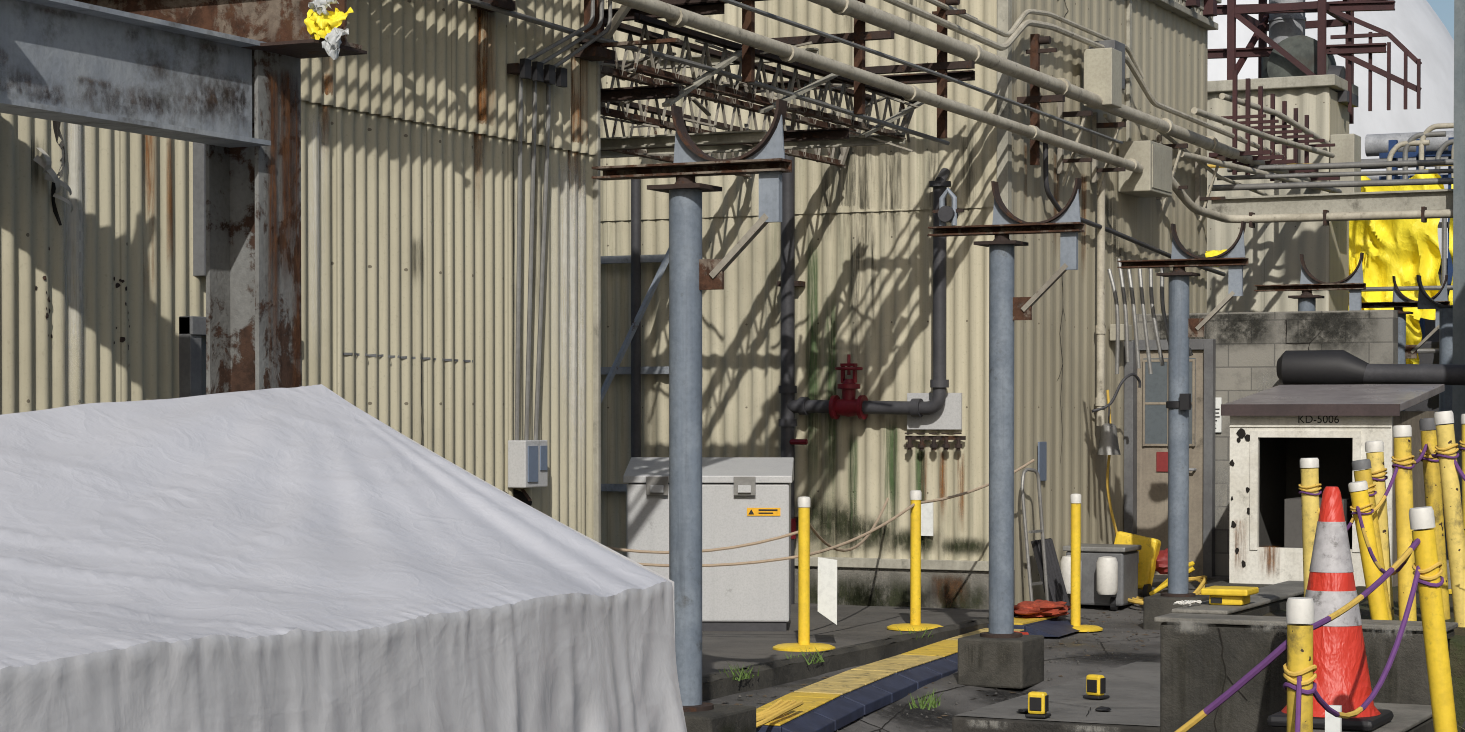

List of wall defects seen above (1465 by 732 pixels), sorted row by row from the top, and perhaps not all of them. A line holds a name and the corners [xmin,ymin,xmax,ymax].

corrosion [474,9,488,160]
corrosion [269,73,300,386]
damp [807,253,857,519]
damp [886,428,897,511]
damp [916,450,924,501]